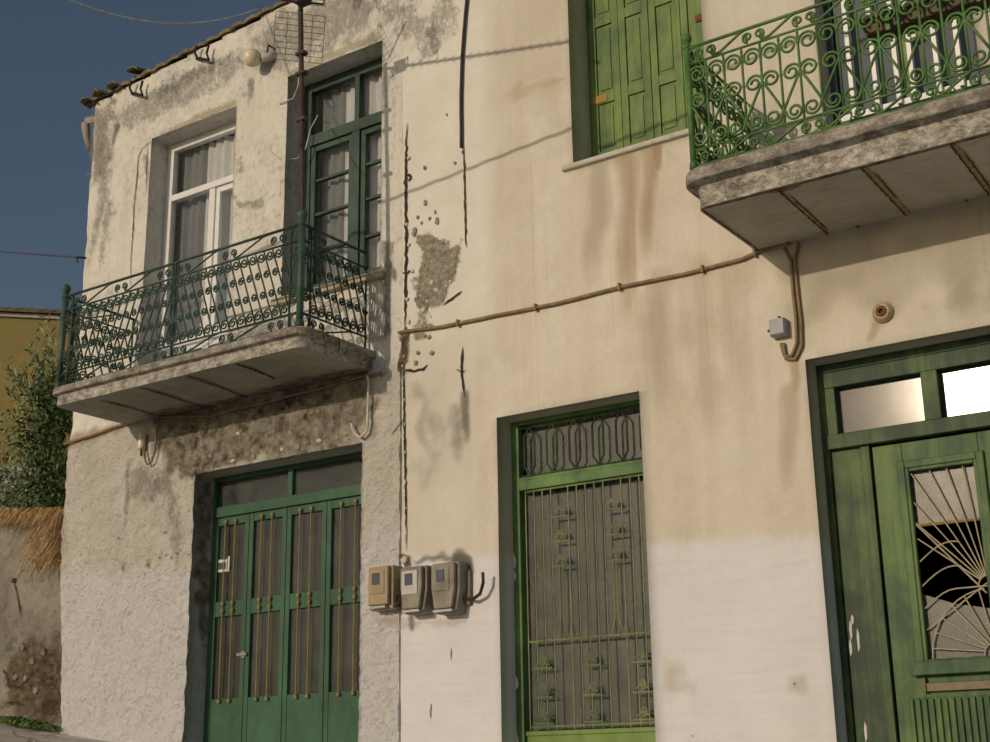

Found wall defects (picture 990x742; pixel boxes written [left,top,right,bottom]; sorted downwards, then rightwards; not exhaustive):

crack [392,128,428,568]
spalling [412,199,461,365]
crack [456,347,467,432]
leakage [166,430,241,646]
peeling [849,615,860,656]